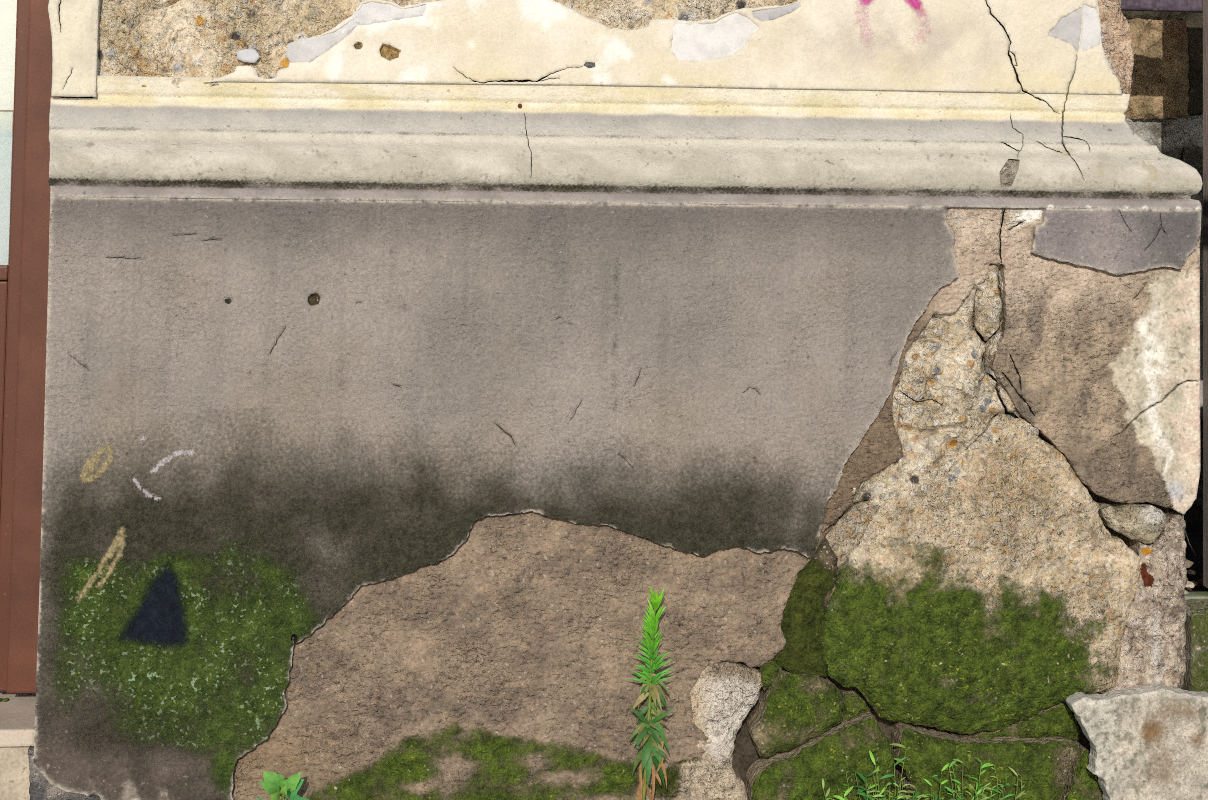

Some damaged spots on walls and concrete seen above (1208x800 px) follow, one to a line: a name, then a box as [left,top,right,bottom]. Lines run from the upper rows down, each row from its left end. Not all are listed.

spalling [98,0,440,88]
spalling [554,0,801,62]
crack [985,0,1086,155]
spalling [1048,0,1134,94]
crack [998,209,1022,289]
crack [972,309,1034,437]
spalling [232,207,1201,800]
water stain [35,456,826,751]
spalling [28,745,101,800]